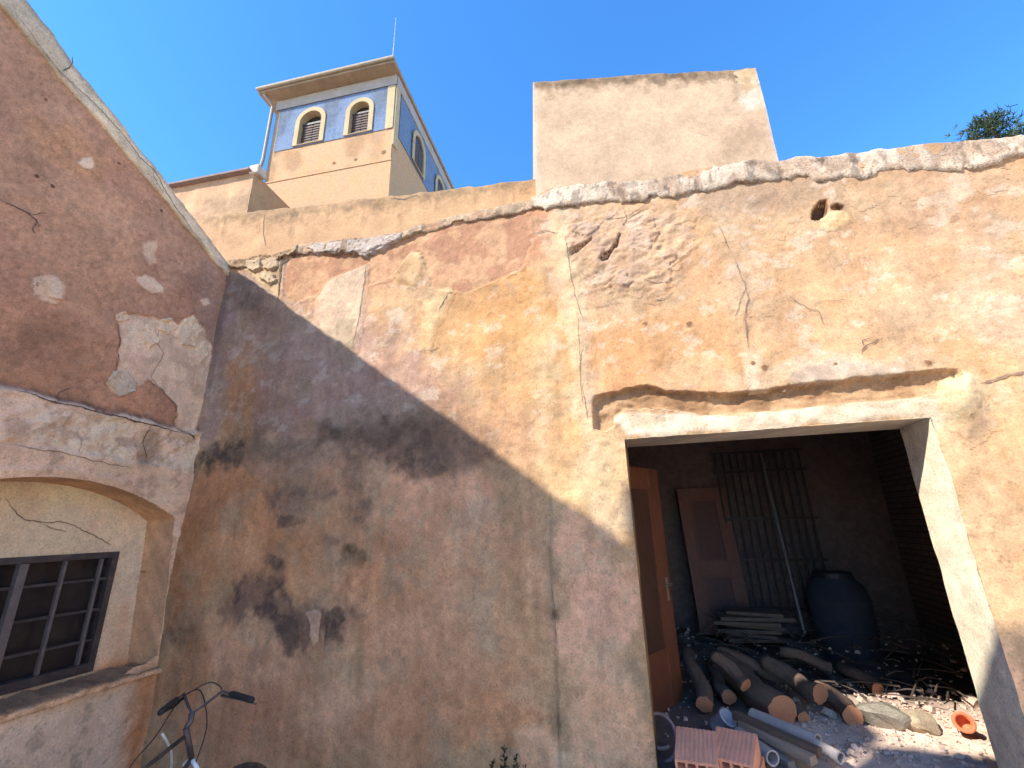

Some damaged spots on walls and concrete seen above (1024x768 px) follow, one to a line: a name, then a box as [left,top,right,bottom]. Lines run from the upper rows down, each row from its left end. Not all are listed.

crack [4,5,208,250]
spalling [23,270,67,306]
spalling [135,239,165,295]
spalling [105,296,213,435]
crack [536,207,643,419]
crack [720,229,750,352]
peeling [818,201,854,233]
crack [8,501,114,547]
crack [6,387,195,469]
water stain [193,389,507,578]
water stain [160,547,374,692]